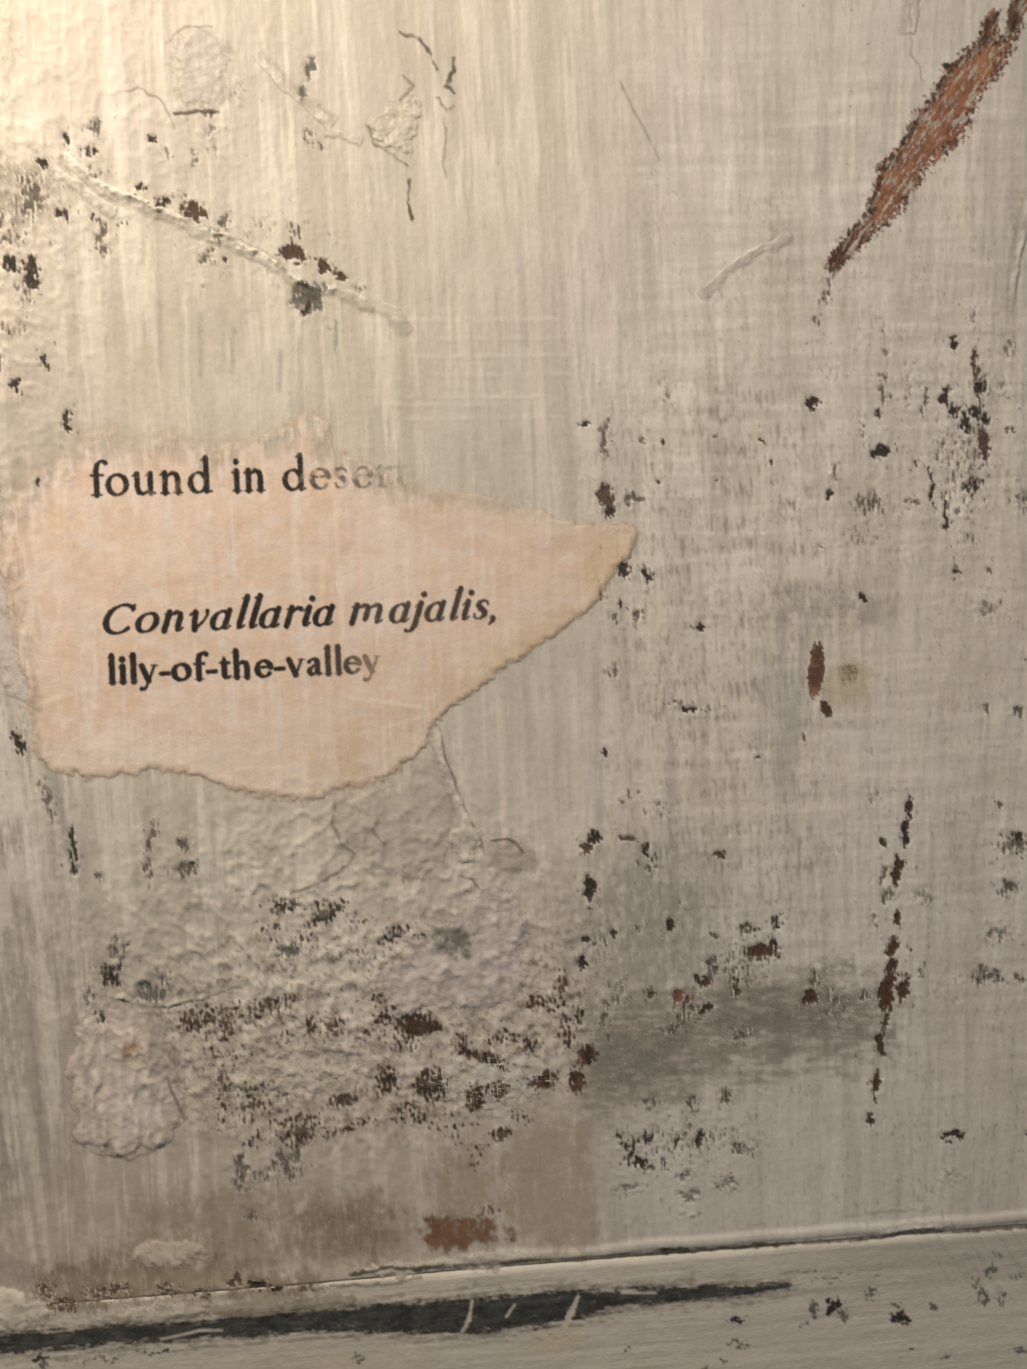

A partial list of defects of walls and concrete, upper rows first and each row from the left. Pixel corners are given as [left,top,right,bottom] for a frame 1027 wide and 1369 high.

crack [902,0,920,34]
peeling [579,829,658,873]
peeling [582,874,597,909]
peeling [643,913,783,1035]
peeling [802,970,844,1015]
peeling [64,886,623,1191]
rust [424,1216,495,1250]